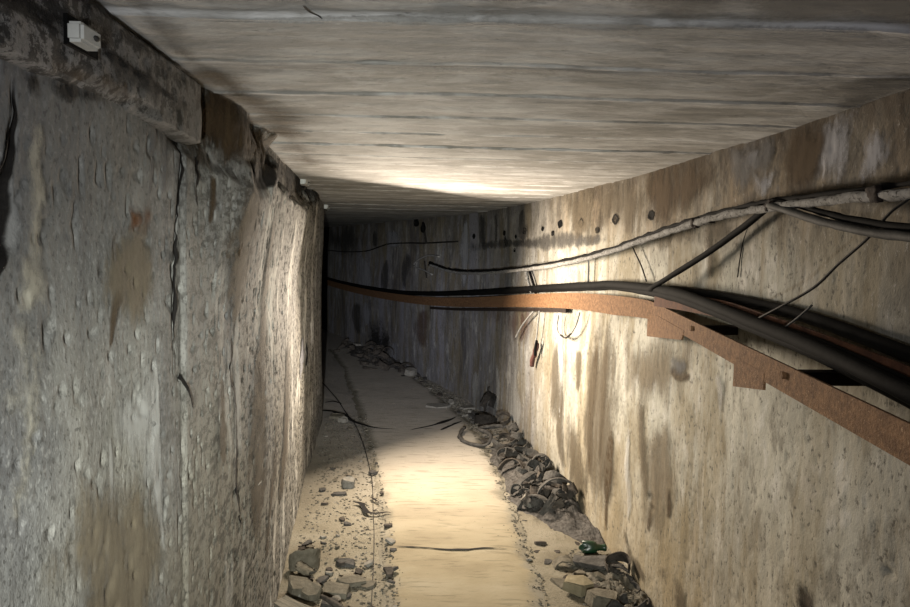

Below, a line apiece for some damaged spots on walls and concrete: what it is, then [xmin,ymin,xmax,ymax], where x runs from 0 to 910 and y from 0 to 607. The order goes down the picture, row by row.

crack [0,89,45,310]
rust [105,212,151,346]
leakage [460,161,715,284]
leakage [784,119,847,187]
efflorescence [862,135,883,181]
crack [26,396,34,433]
leakage [496,367,520,425]
leakage [550,330,615,526]
leakage [624,343,690,530]